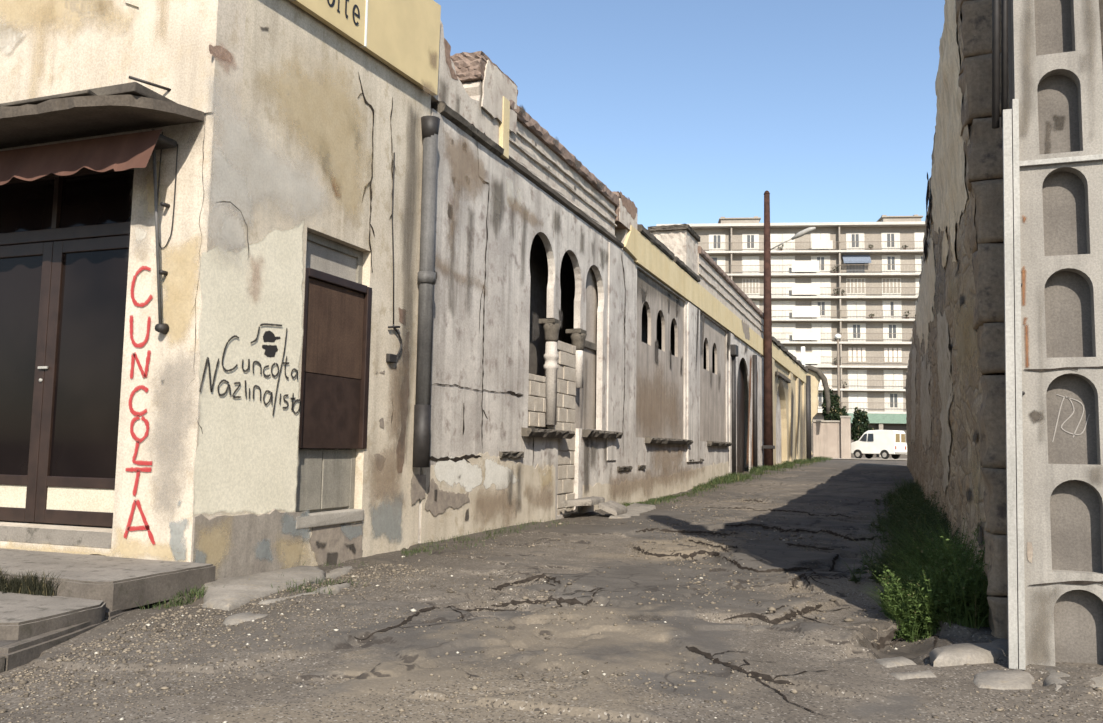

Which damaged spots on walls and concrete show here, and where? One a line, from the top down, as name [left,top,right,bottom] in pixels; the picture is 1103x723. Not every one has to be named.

water stain [270,64,362,213]
crack [358,72,396,272]
water stain [449,139,537,257]
peeling [6,221,518,565]
crack [430,146,523,463]